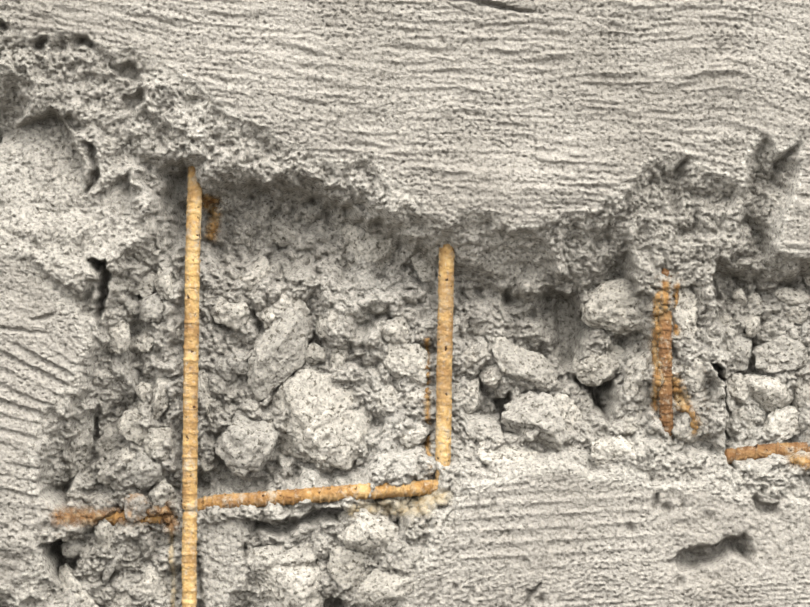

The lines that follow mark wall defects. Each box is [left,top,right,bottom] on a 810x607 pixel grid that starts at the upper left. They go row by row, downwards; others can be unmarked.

crack [357,0,548,24]
corrosion [202,194,221,241]
spalling [712,130,804,285]
spalling [0,493,174,607]
corrosion [52,502,180,607]
spalling [181,166,204,607]
spalling [195,496,415,607]
spalling [266,369,373,472]
corrosion [345,490,453,518]
corrosion [650,281,701,435]
spalling [693,240,810,526]
corrosion [786,452,810,470]